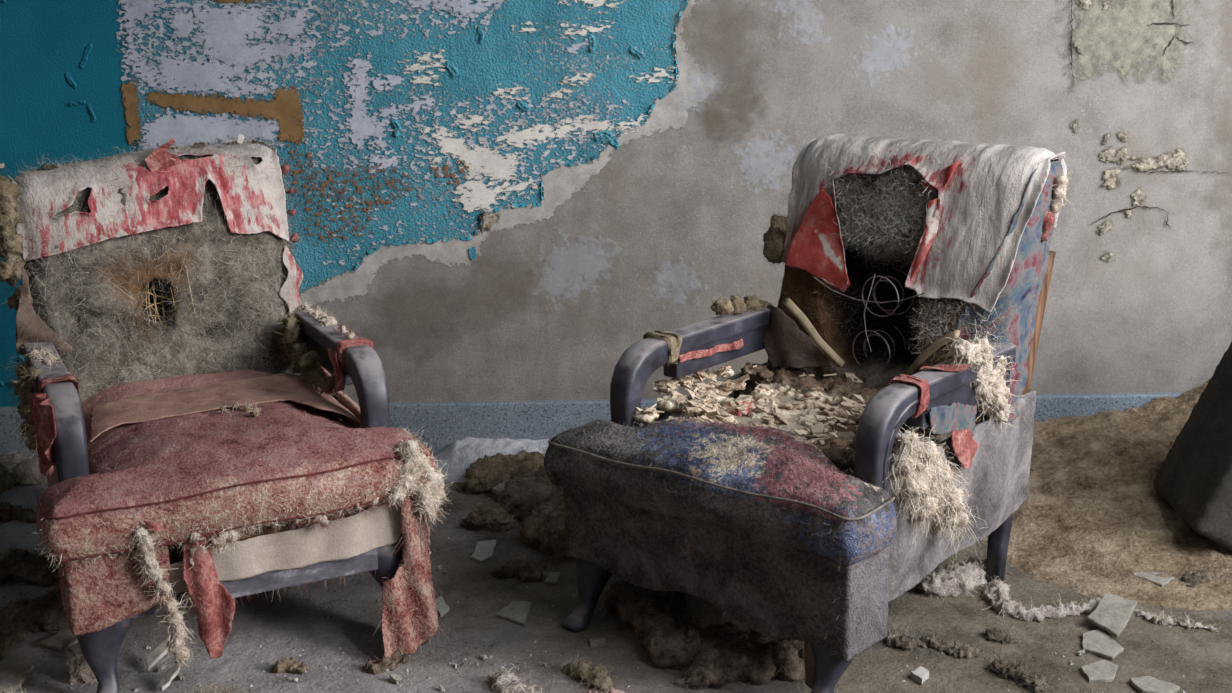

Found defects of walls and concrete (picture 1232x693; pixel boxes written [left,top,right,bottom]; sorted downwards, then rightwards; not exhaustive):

crack [1070,0,1084,81]
crack [1148,0,1194,56]
peeling [111,0,1232,403]